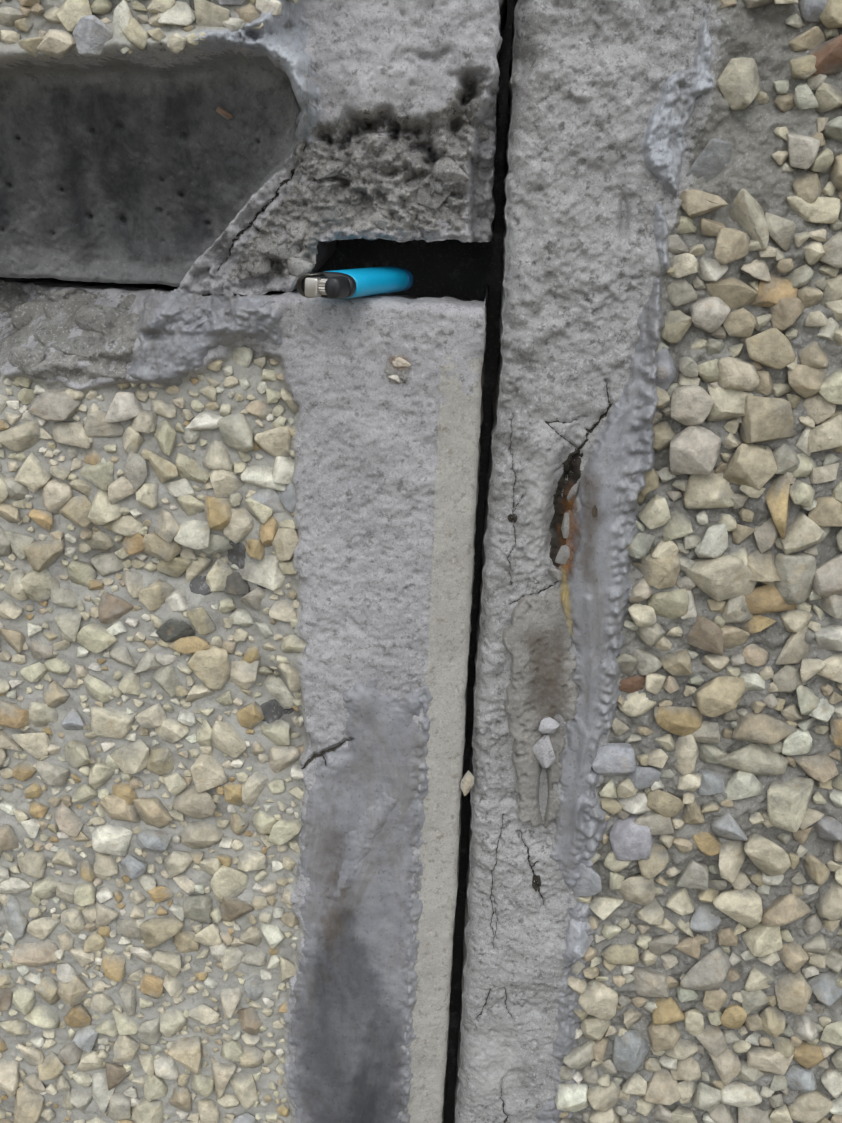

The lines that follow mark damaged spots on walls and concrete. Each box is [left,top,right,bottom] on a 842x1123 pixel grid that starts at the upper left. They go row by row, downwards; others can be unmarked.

spalling [226,78,489,283]
crack [545,380,612,477]
crack [507,416,559,604]
crack [490,815,544,947]
crack [476,987,513,1019]
crack [500,1075,508,1123]